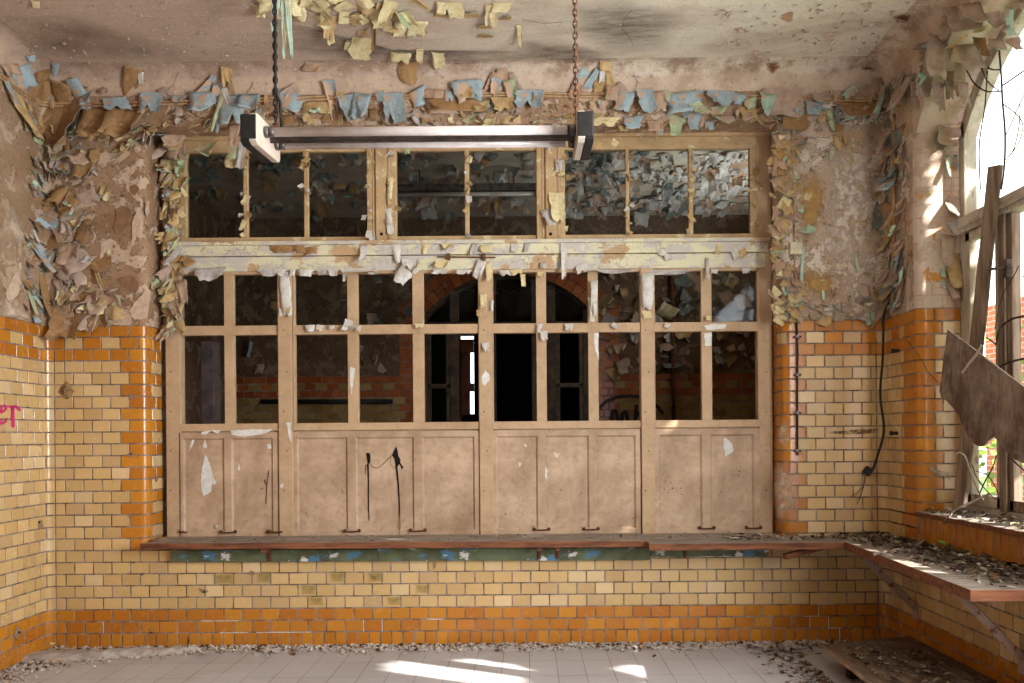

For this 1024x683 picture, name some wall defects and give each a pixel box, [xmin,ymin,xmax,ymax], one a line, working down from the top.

peeling [350,345,387,395]
peeling [1,0,1024,382]